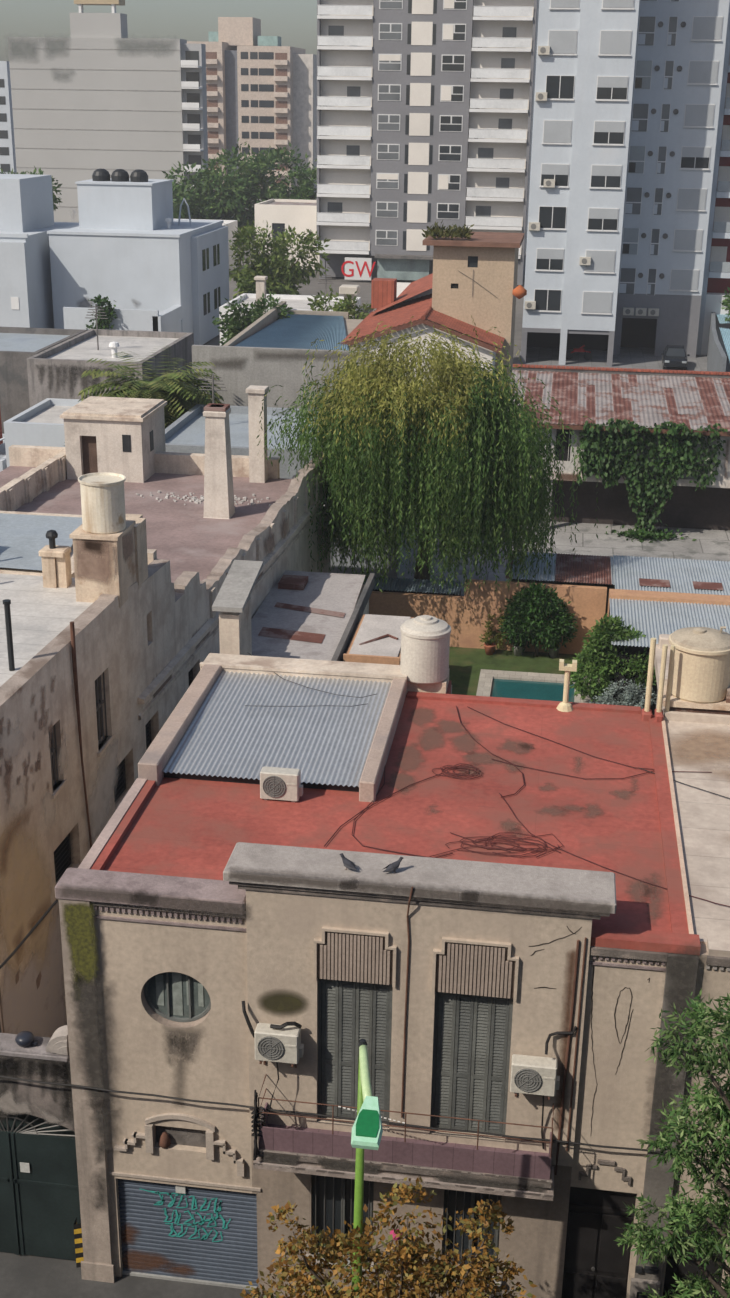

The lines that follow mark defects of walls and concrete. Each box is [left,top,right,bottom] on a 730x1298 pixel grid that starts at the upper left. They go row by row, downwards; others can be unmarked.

flaking render [0,713,62,789]
crack [529,926,582,956]
damp [0,981,111,1160]
crack [591,961,650,1131]
corrosion [120,1226,192,1274]